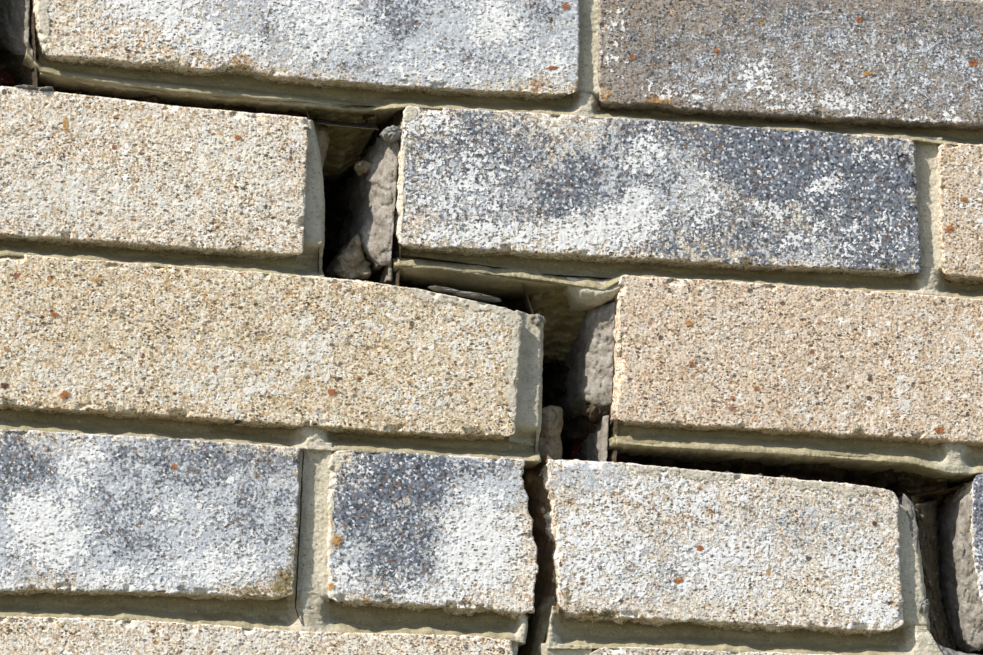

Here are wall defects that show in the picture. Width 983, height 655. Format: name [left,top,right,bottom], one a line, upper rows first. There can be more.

crack [0,0,403,278]
crack [361,203,607,315]
crack [522,360,966,624]